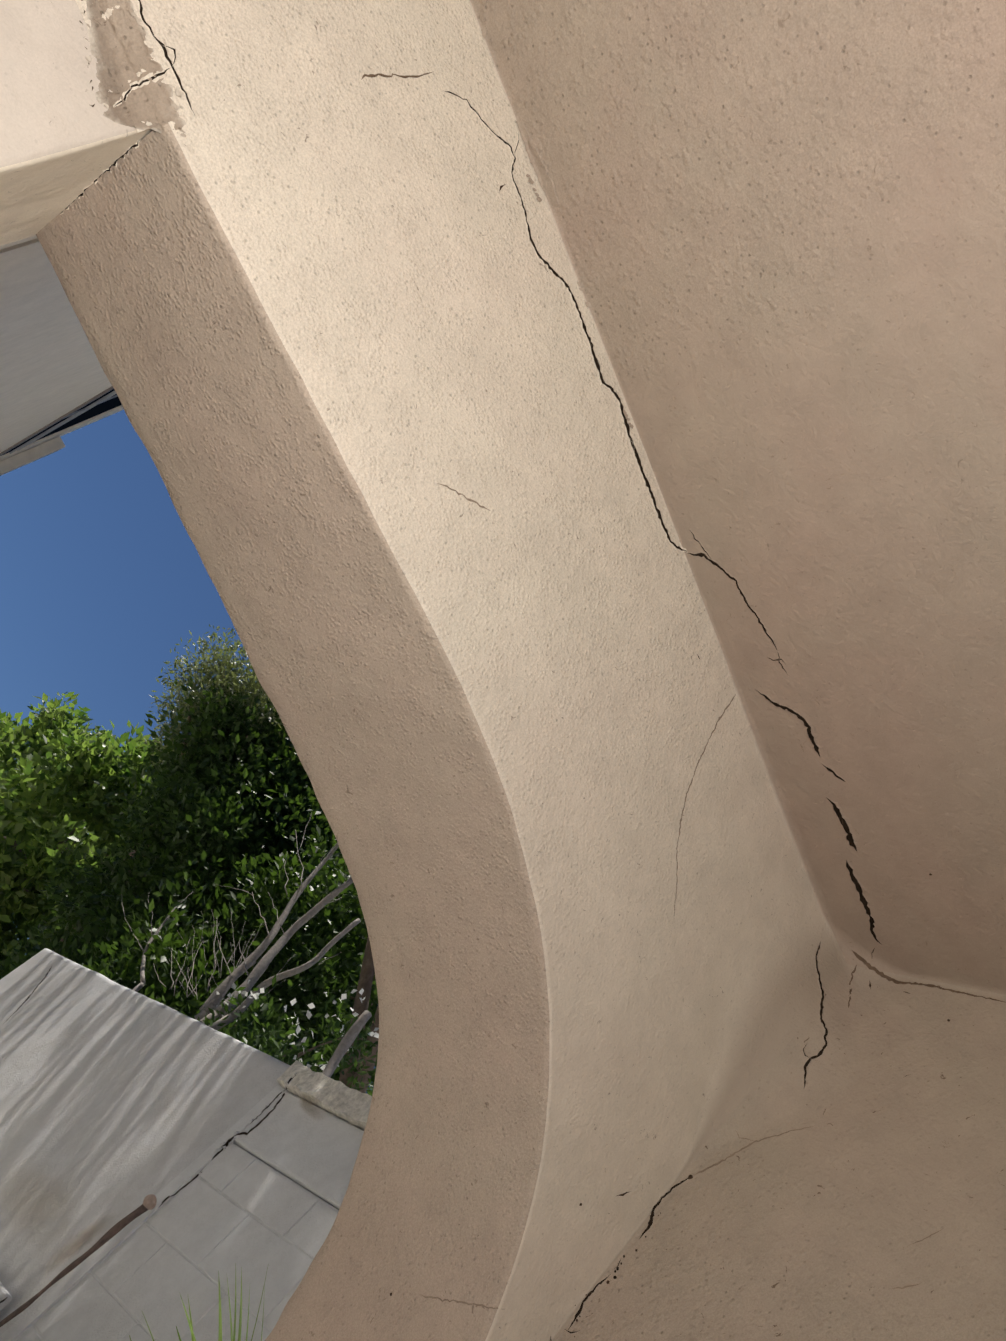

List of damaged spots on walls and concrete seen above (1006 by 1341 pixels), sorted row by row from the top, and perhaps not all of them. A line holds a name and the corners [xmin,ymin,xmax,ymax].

spalling [79,0,186,137]
crack [362,72,1004,1089]
crack [419,1294,498,1309]
crack [549,1126,814,1341]